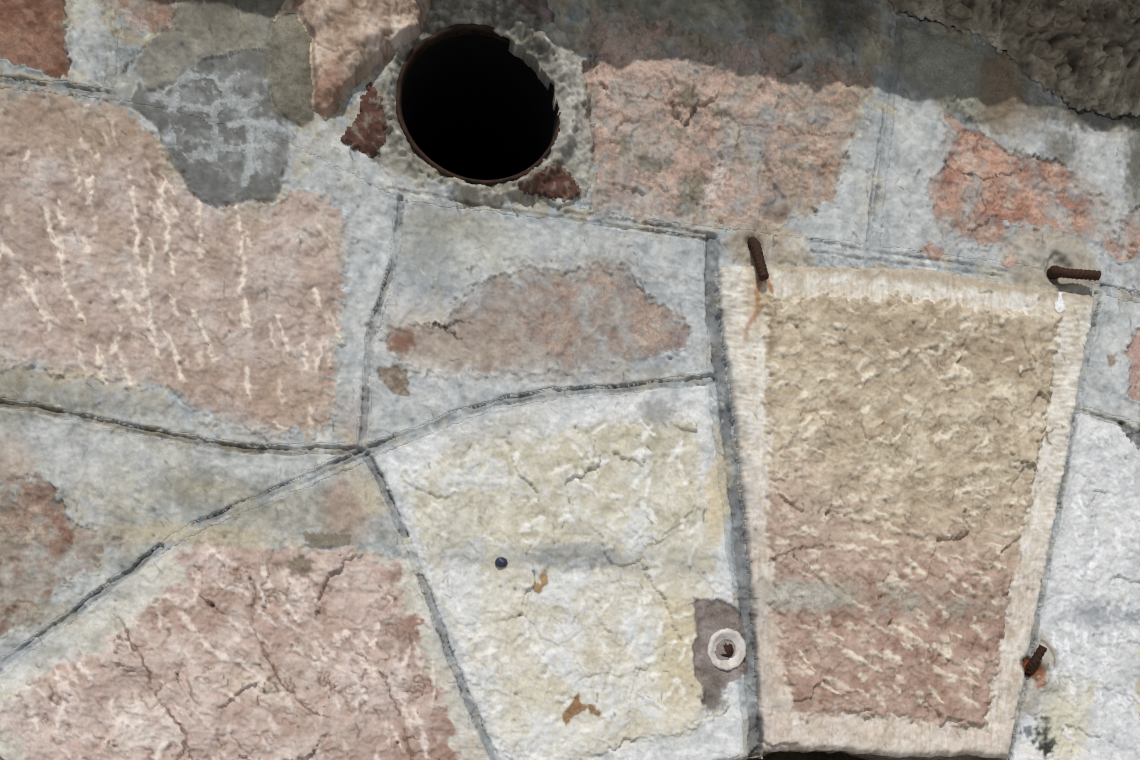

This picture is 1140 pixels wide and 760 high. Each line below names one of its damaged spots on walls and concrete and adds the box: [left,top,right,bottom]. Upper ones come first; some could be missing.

corrosion [755,278,773,316]
corrosion [533,570,548,593]
crack [246,571,327,717]
crack [114,614,193,760]
crack [352,649,417,760]
corrosion [563,694,600,723]
corrosion [1022,659,1046,684]